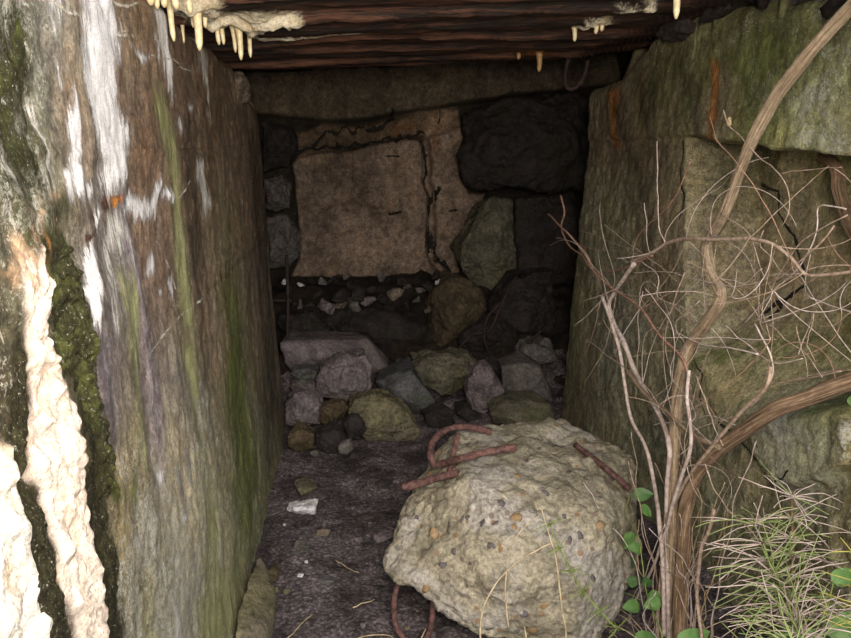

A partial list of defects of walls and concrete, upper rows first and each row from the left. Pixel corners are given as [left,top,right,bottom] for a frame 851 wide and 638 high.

damp [47,0,62,37]
damp [571,16,613,42]
damp [618,0,656,14]
damp [673,0,681,19]
damp [26,104,57,199]
damp [64,0,371,332]
crack [263,106,457,272]
damp [0,238,110,638]